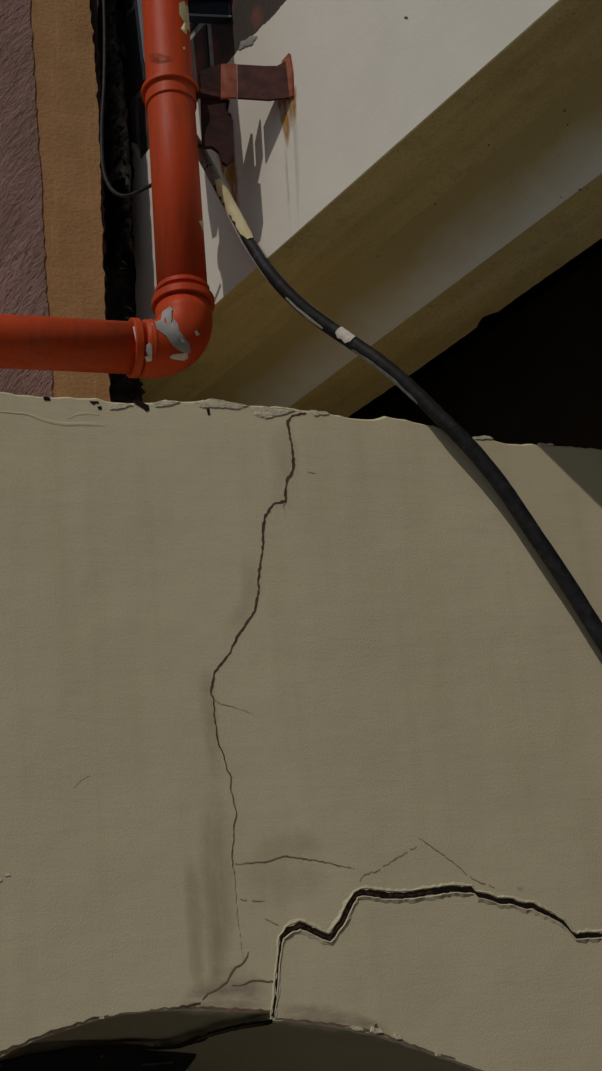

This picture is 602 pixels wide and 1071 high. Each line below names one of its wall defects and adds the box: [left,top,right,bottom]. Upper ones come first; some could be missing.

rust [279,92,295,139]
crack [1,412,602,1063]